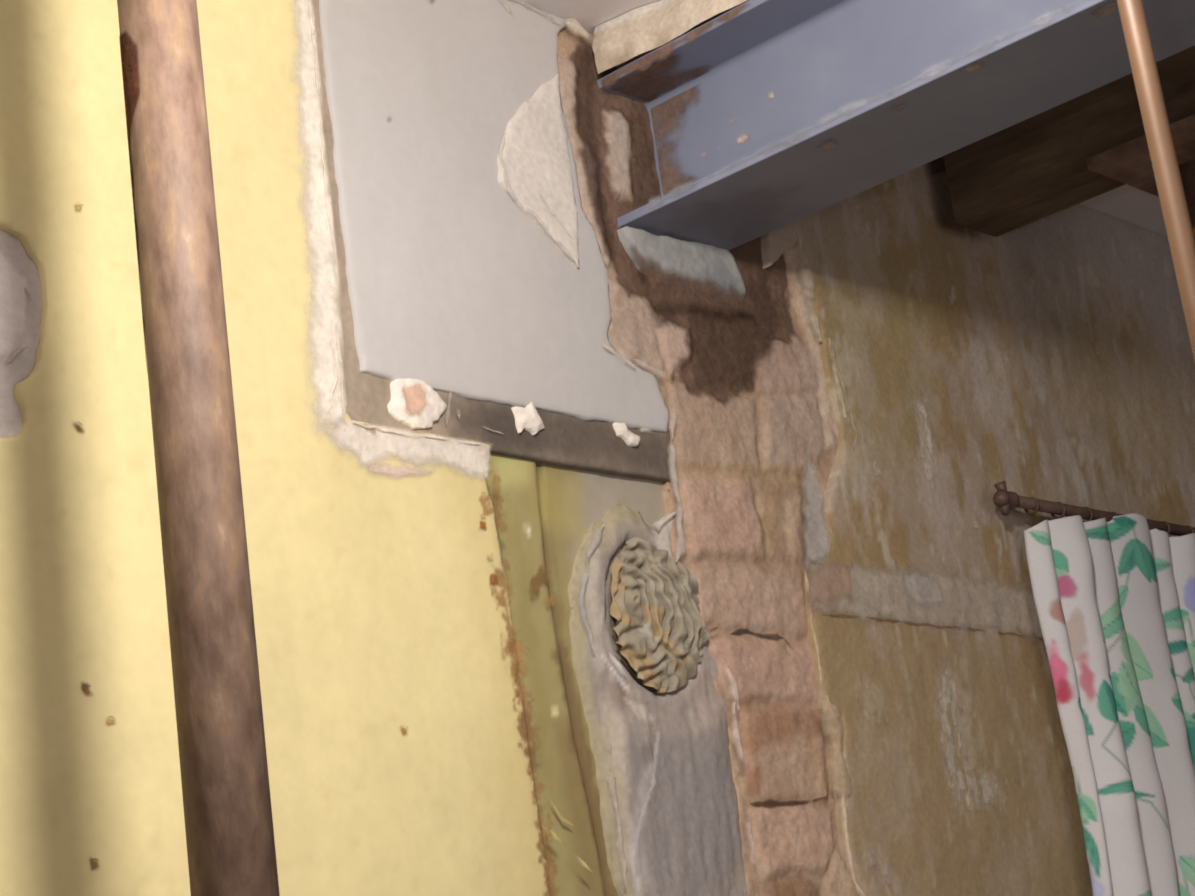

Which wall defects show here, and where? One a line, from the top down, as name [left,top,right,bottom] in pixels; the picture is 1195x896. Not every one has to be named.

corrosion [601,4,745,196]
peeling [0,229,43,439]
peeling [296,0,504,477]
flaking render [558,0,979,896]
crack [698,628,789,644]
crack [750,784,829,807]